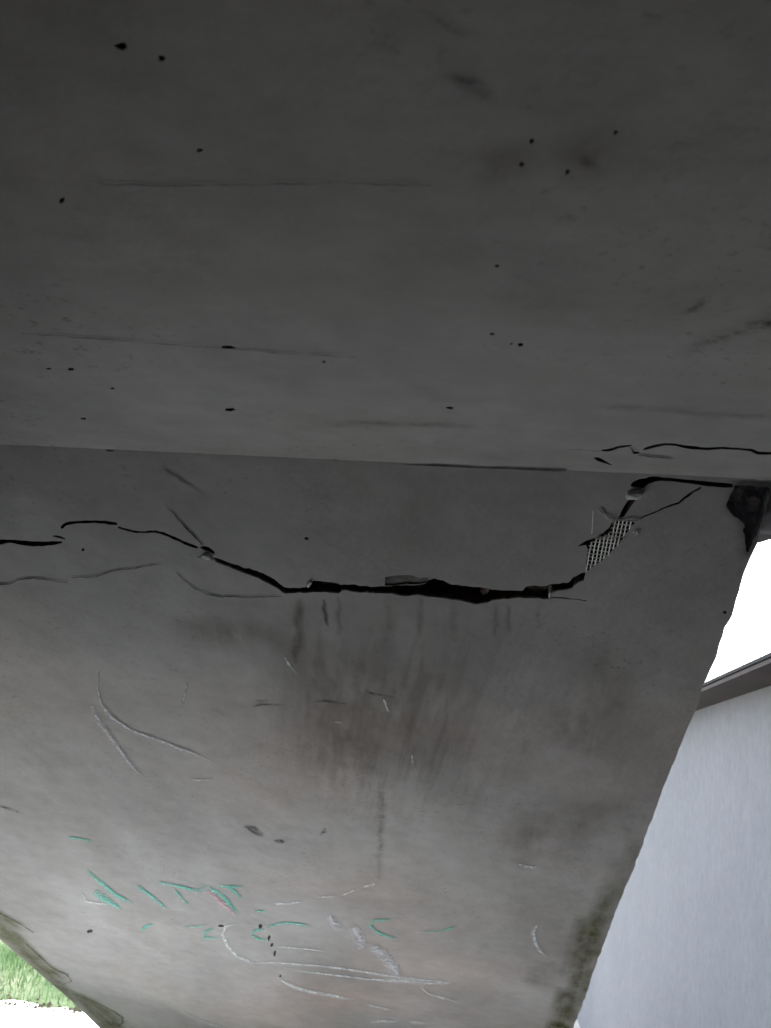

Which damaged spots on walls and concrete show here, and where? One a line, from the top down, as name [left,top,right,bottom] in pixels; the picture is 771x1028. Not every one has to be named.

crack [0,443,771,604]